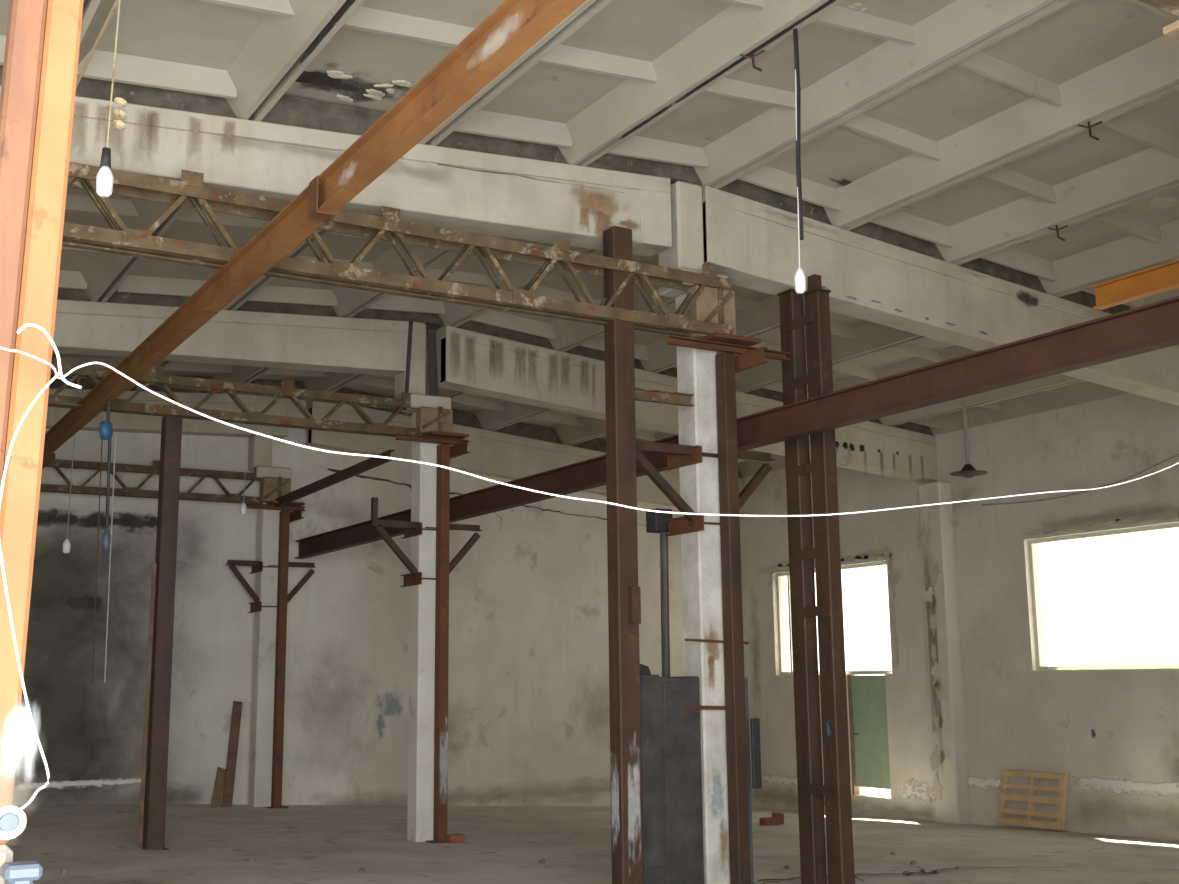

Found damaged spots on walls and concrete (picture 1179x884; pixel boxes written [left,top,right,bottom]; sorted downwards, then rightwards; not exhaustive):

water stain [75,105,84,137]
water stain [98,108,121,143]
corrosion [580,191,637,236]
water stain [452,334,473,364]
water stain [14,531,144,804]
flaking render [901,493,947,802]